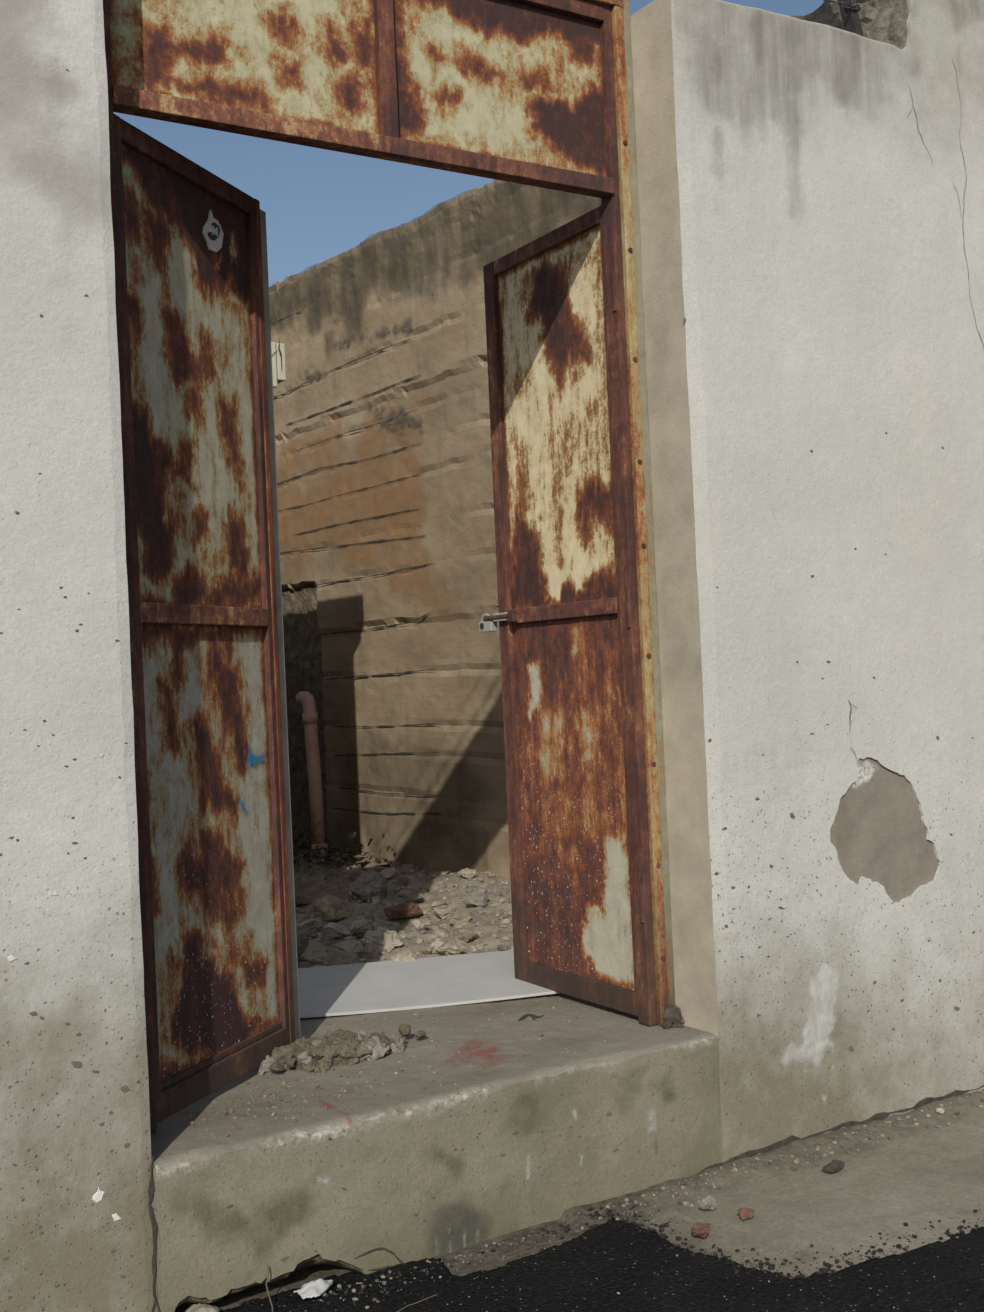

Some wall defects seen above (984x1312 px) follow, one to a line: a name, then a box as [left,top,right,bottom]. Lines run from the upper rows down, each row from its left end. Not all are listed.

spalling [791,0,844,30]
spalling [856,0,909,50]
crack [907,59,984,347]
peeling [830,757,939,902]
damp [801,964,838,1060]
spalling [175,1243,403,1309]